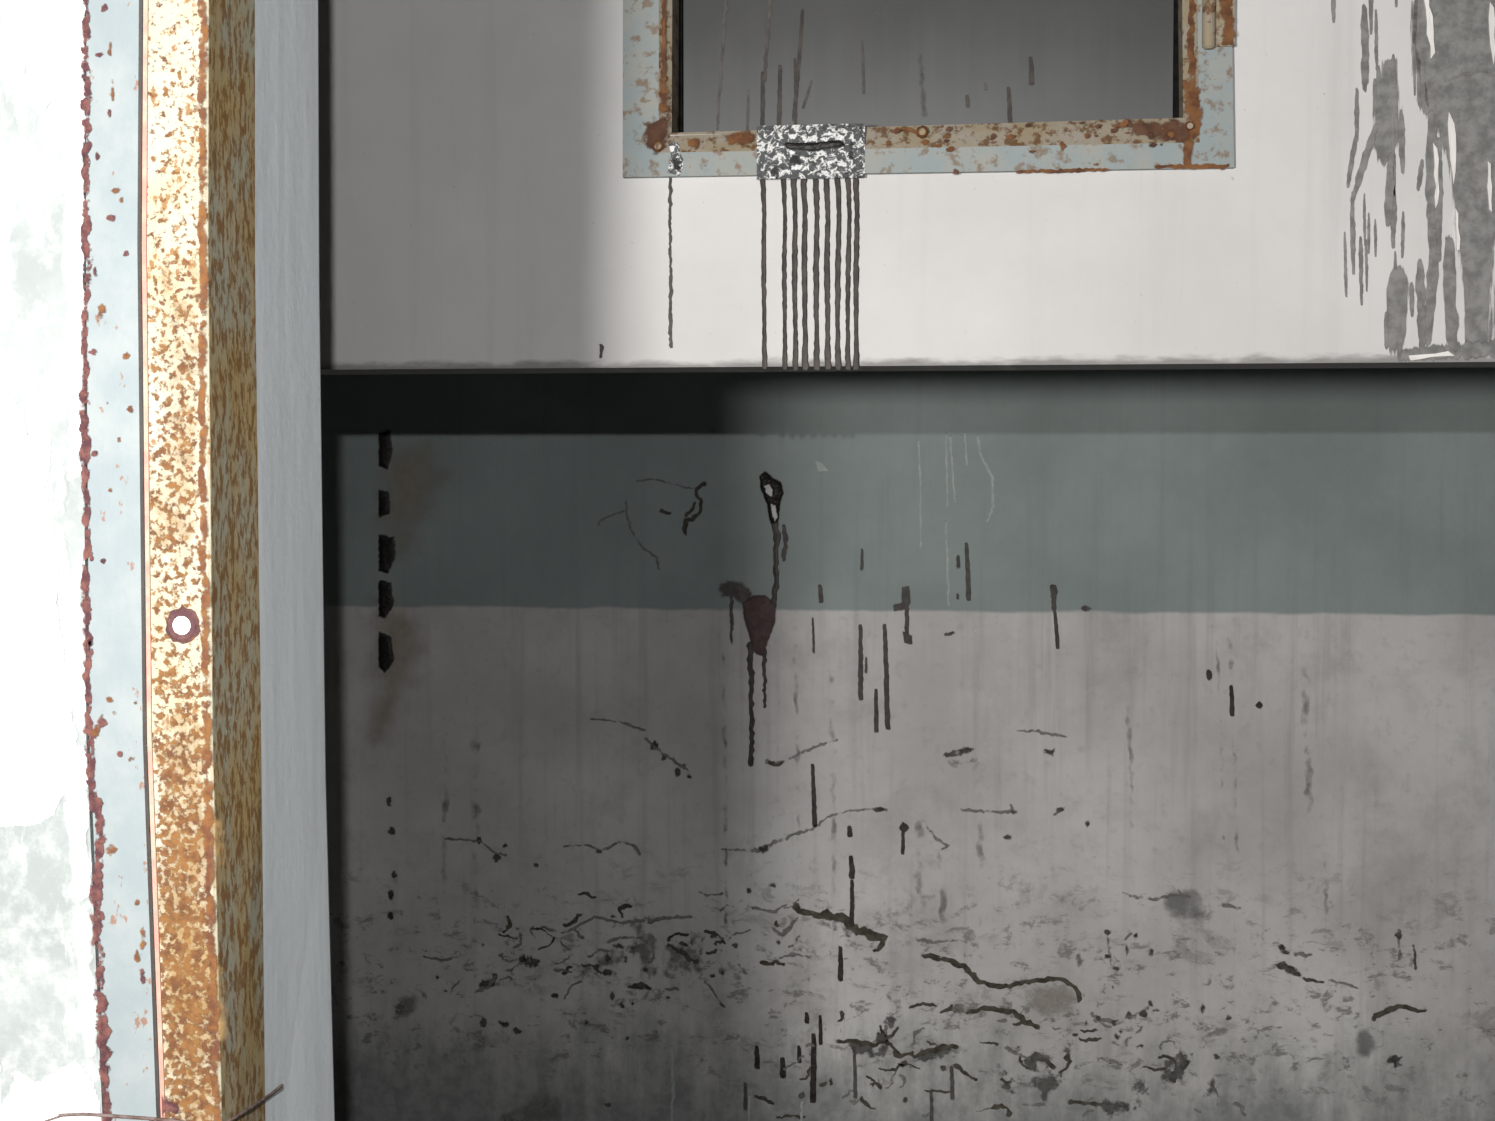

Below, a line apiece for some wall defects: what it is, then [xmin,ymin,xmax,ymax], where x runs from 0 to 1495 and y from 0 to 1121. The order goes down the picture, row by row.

corrosion [644,0,671,154]
water stain [667,141,683,348]
water stain [760,178,860,371]
corrosion [886,125,959,174]
corrosion [1016,150,1110,174]
corrosion [1079,0,1229,170]
corrosion [1219,0,1236,46]
peeling [1344,0,1495,362]
peeling [0,0,101,1121]
corrosion [78,0,122,1121]
corrosion [134,0,221,1121]
crack [773,903,1082,1029]